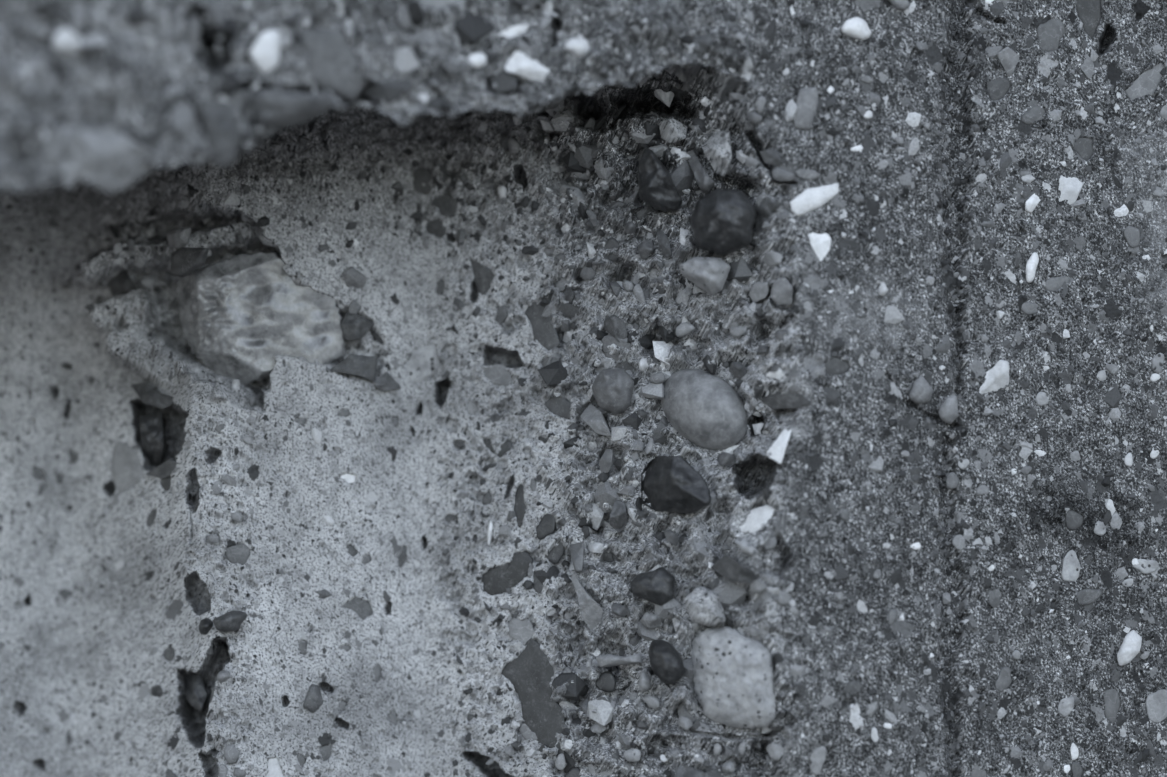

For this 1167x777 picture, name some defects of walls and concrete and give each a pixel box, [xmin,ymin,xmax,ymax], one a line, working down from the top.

peeling [840,89,936,189]
peeling [974,135,1040,213]
peeling [1043,85,1105,141]
peeling [1113,171,1167,218]
peeling [878,282,910,330]
spalling [236,5,898,777]
crack [884,0,1008,777]
spalling [81,203,398,777]
peeling [984,434,1046,488]
peeling [874,515,939,606]
peeling [1063,437,1167,765]
peeling [986,707,1045,774]